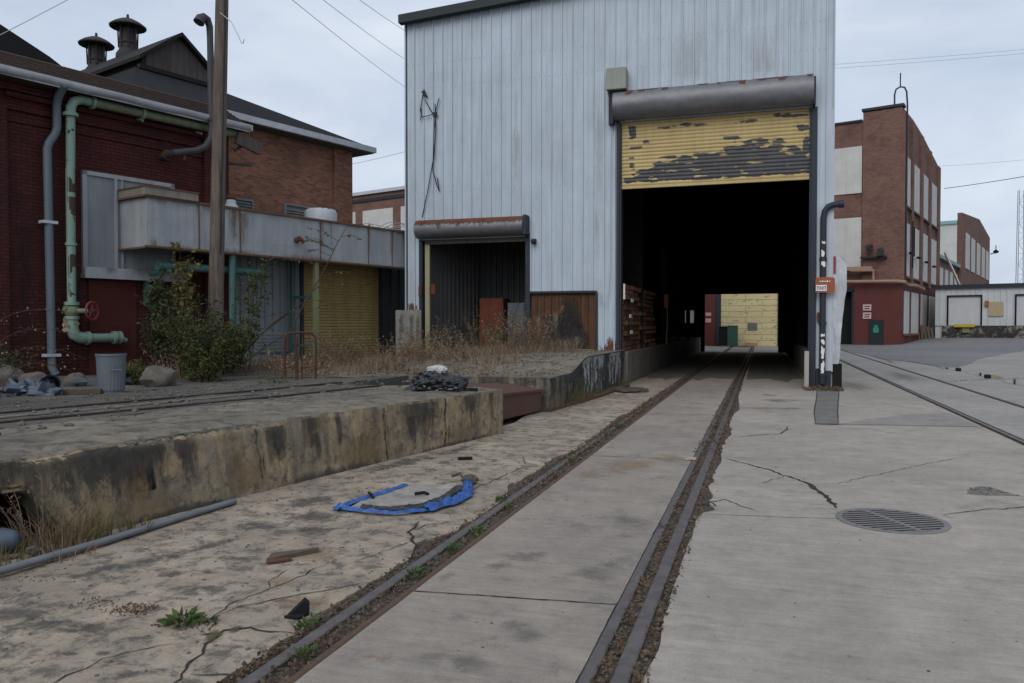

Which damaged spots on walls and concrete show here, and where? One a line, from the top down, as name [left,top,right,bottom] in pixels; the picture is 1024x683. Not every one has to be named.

peeling [624,113,810,184]
corrosion [414,216,523,228]
leakage [0,438,194,523]
leakage [200,522,276,561]
leakage [264,425,286,455]
leakage [288,497,335,532]
crack [729,428,967,508]
crack [54,521,438,683]